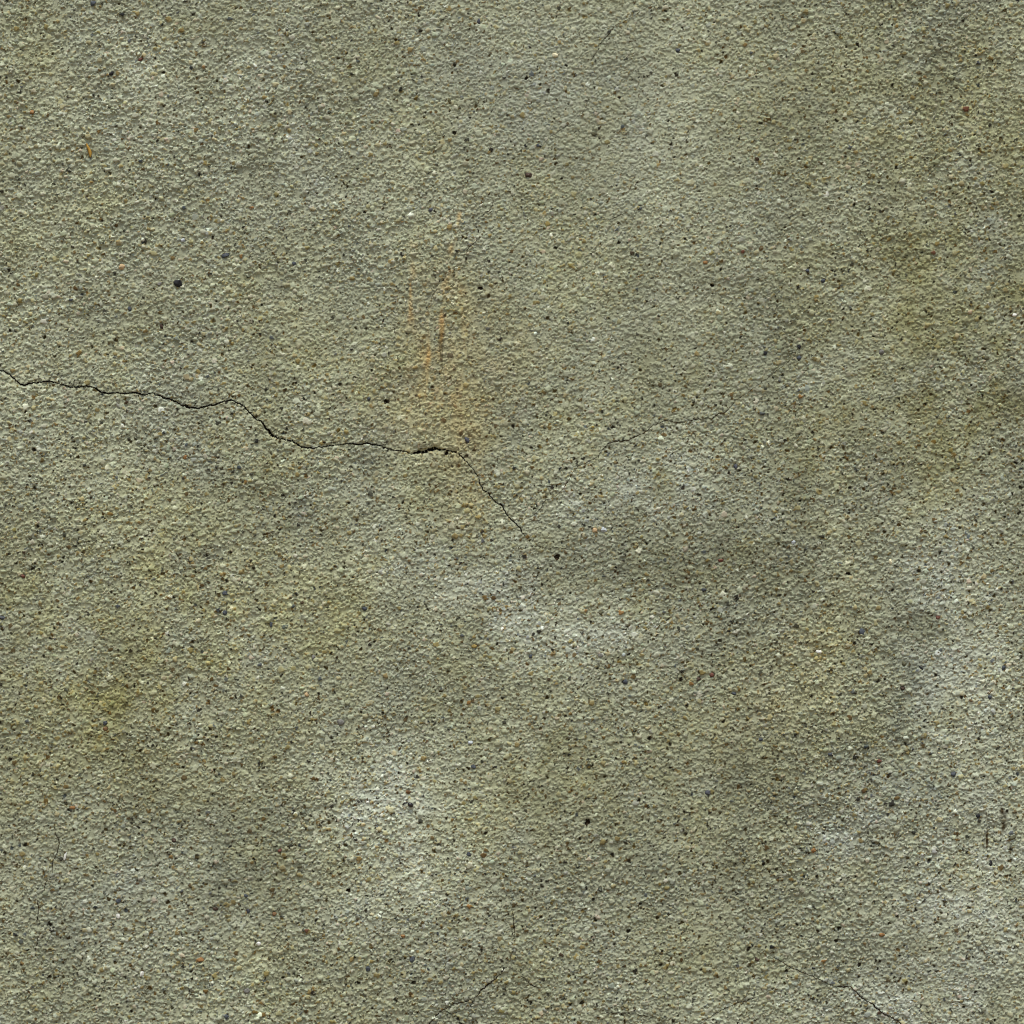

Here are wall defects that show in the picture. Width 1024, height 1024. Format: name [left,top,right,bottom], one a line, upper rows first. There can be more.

crack [0,352,800,551]